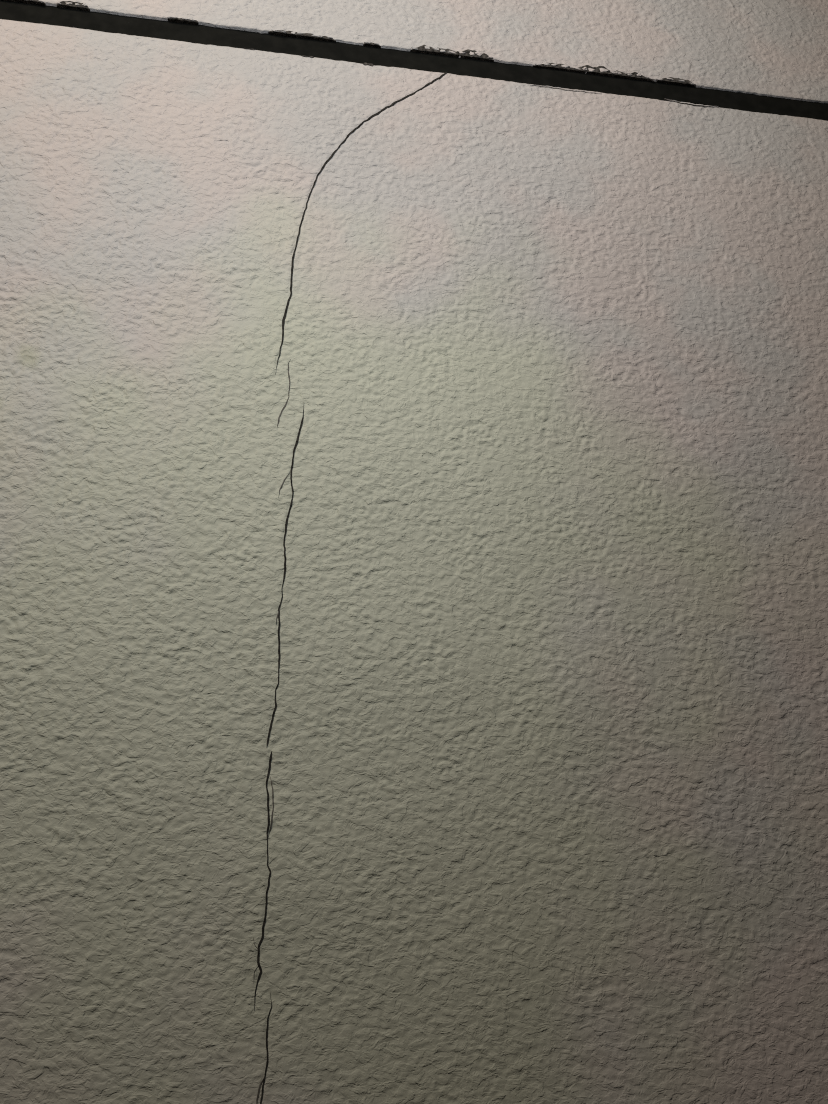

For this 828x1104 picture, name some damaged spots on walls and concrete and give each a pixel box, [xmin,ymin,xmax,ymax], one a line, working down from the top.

crack [253,72,447,1104]